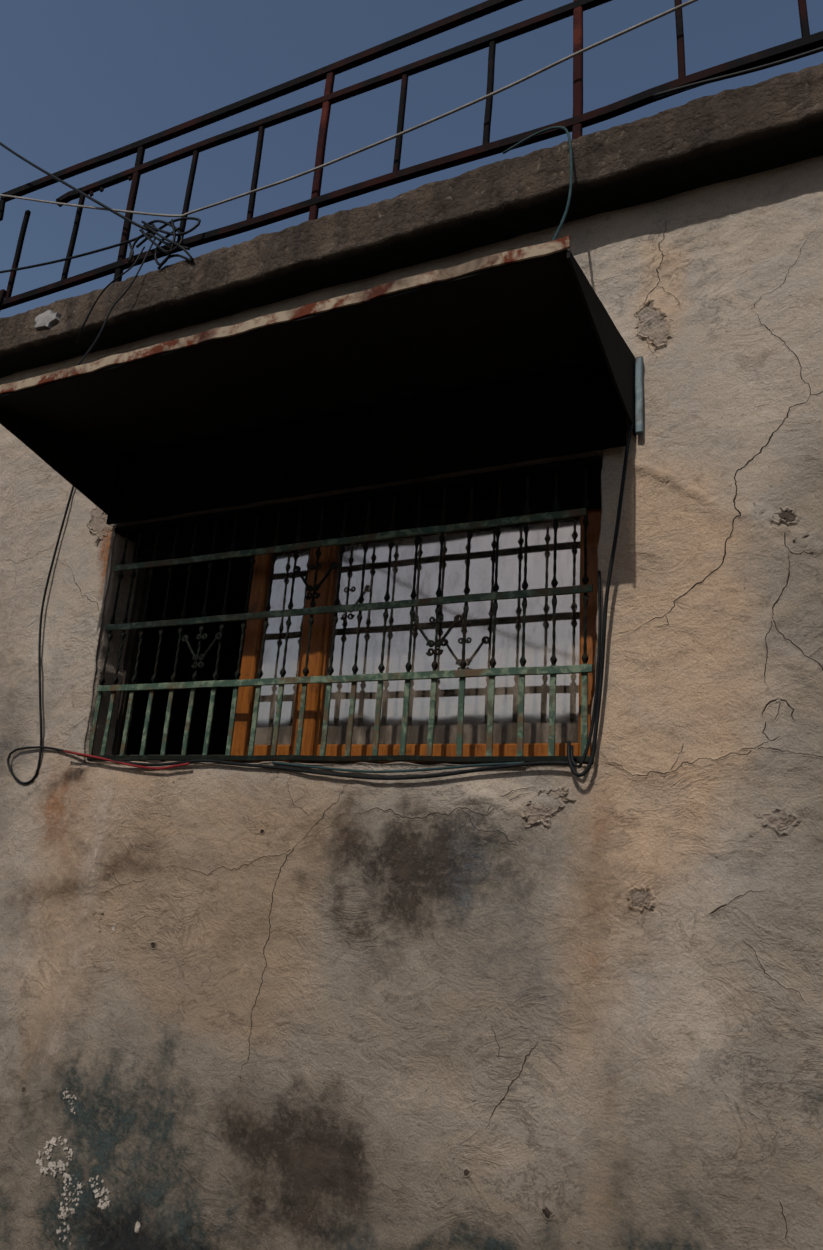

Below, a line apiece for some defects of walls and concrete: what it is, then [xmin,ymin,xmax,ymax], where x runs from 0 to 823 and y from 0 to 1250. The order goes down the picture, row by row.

spalling [633,297,673,352]
crack [613,219,823,635]
spalling [769,506,801,527]
crack [762,532,823,690]
crack [606,741,823,779]
crack [25,773,535,1094]
water stain [37,1059,232,1250]